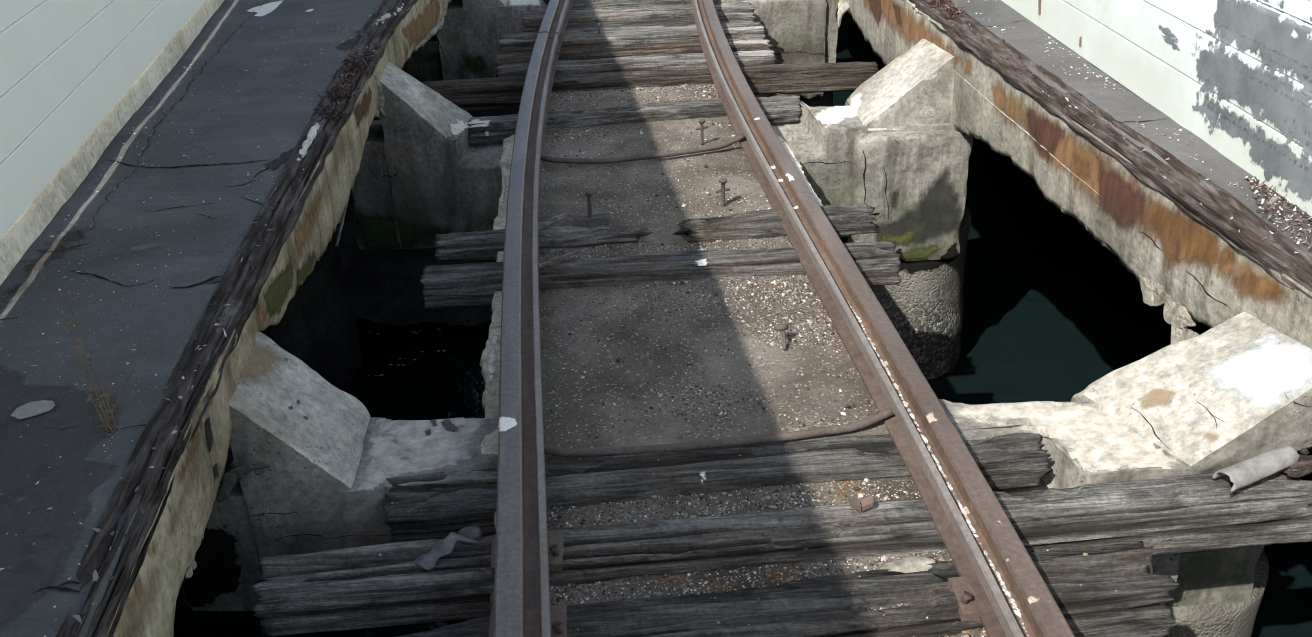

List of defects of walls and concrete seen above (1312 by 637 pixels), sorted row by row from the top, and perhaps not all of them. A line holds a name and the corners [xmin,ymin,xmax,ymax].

crack [35,0,275,288]
water stain [878,170,960,274]
corrosion [864,0,1312,303]
peeling [1139,275,1199,344]
peeling [1159,0,1312,203]
crack [1132,407,1171,450]